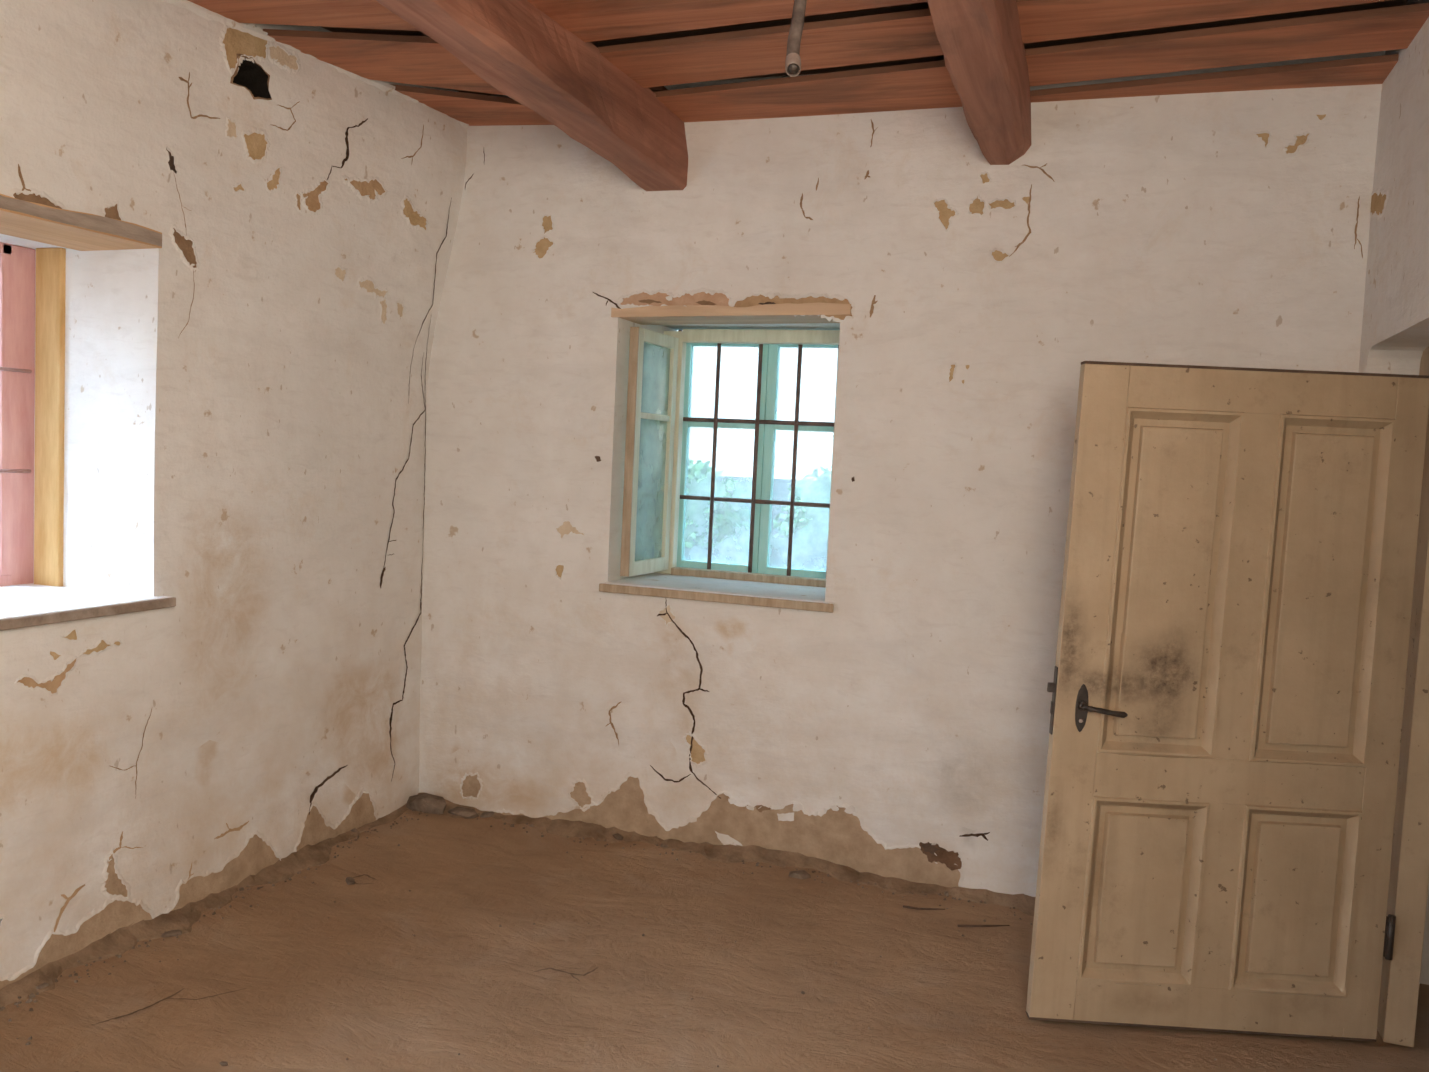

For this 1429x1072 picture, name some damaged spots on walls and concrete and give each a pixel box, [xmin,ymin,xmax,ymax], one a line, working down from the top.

peeling [219,23,301,100]
peeling [225,117,429,233]
crack [327,118,368,180]
crack [1009,164,1054,257]
peeling [616,288,855,322]
crack [380,151,485,781]
leakage [164,478,286,798]
crack [650,600,721,799]
leakage [0,692,130,881]
crack [309,765,348,815]
peeling [496,772,964,887]
peeling [0,788,378,989]